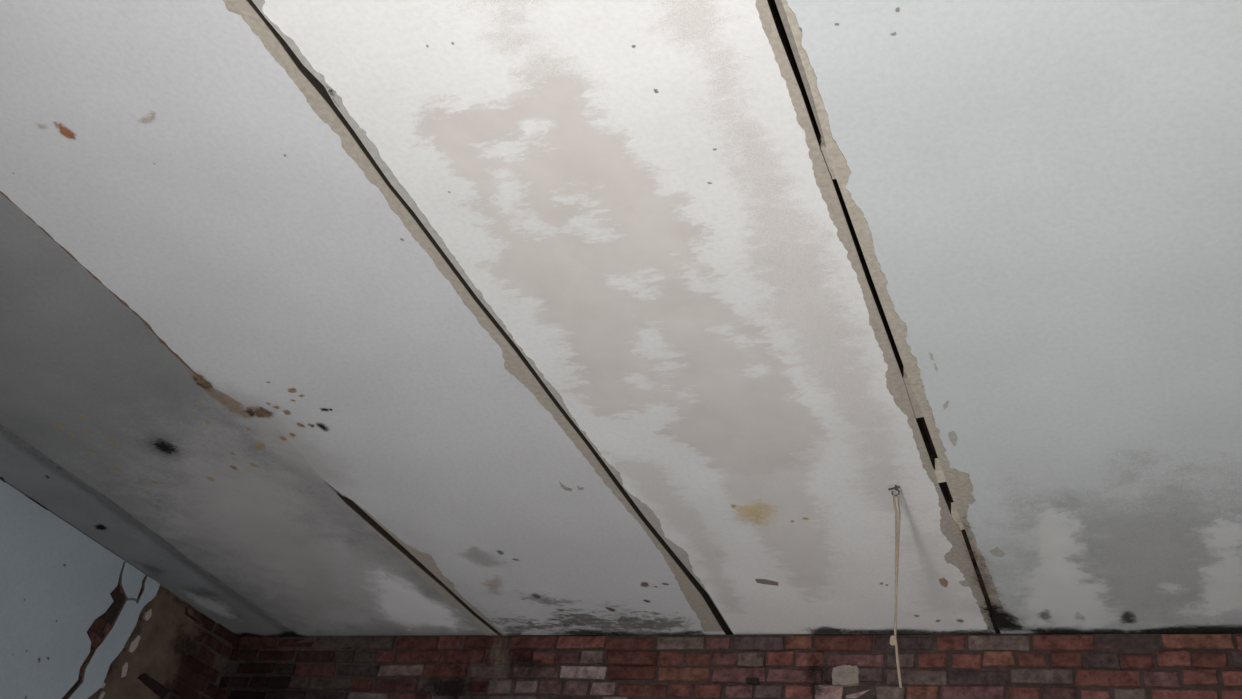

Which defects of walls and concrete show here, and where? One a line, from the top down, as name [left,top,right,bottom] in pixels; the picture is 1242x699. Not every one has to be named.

rust [37,121,77,140]
rust [187,368,332,470]
crack [0,424,292,695]
flaking render [89,585,238,699]
damp [414,545,709,699]
damp [793,445,1242,697]